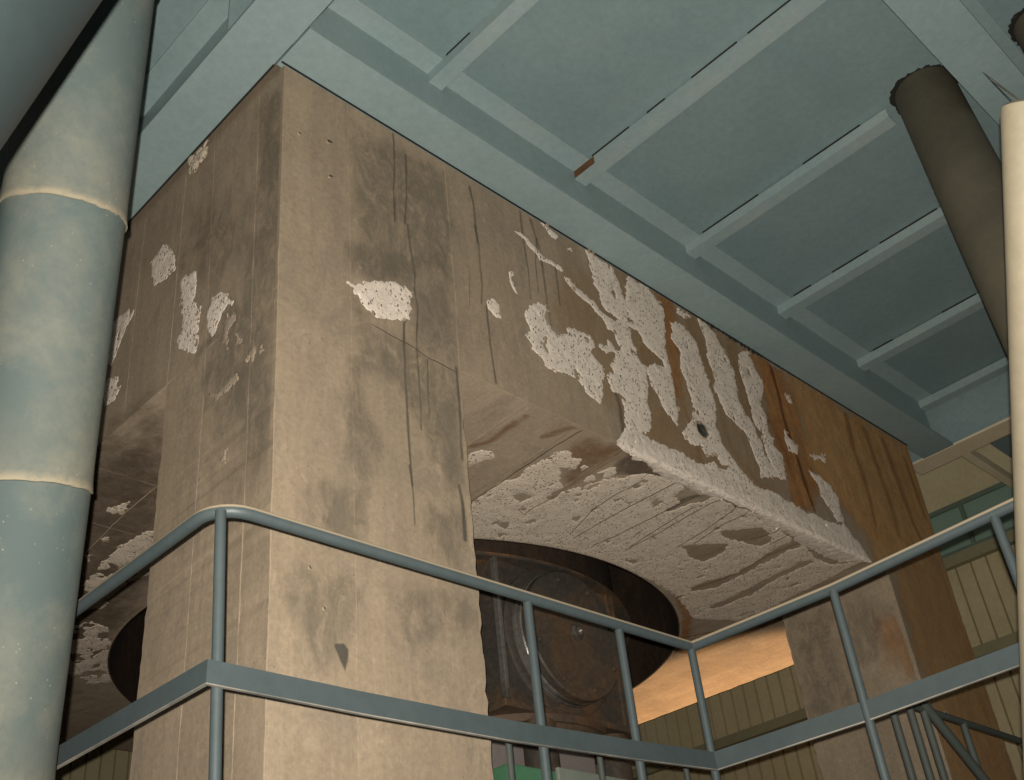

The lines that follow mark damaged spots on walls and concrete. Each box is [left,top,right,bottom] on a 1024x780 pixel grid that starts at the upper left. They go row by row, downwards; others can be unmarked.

peeling [103,309,134,406]
peeling [149,244,265,362]
peeling [209,373,239,401]
peeling [346,280,414,322]
crack [372,324,455,372]
peeling [468,231,872,621]
peeling [106,501,130,515]
crack [570,479,787,550]
corrosion [751,354,975,675]
peeling [68,531,153,684]
corrosion [934,681,1012,780]